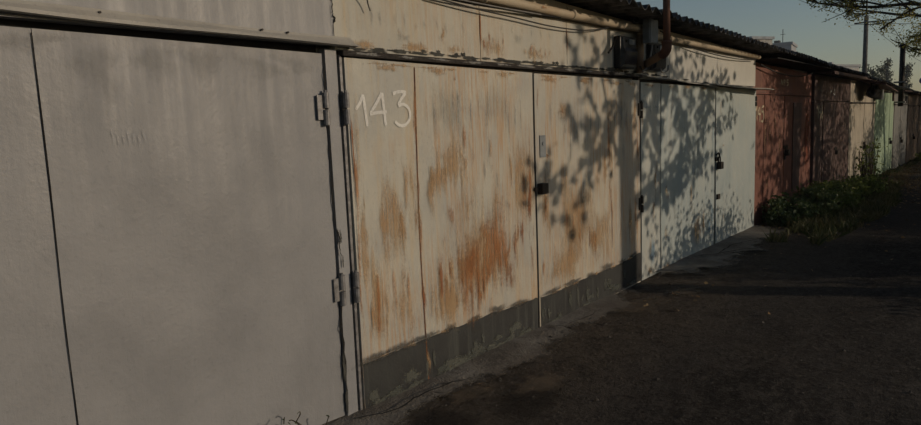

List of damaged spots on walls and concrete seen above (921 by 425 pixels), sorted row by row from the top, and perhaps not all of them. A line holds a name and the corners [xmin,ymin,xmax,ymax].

corrosion [357,216,389,331]
corrosion [422,152,534,318]
corrosion [543,188,613,278]